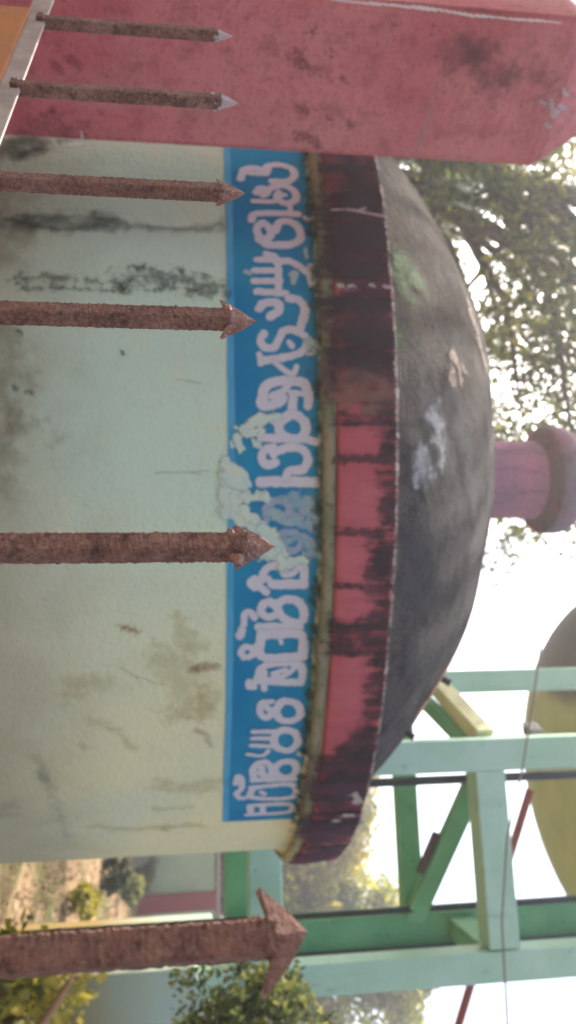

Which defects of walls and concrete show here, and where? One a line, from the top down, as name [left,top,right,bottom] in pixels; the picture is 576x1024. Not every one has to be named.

spalling [448,350,469,388]
peeling [217,411,323,574]